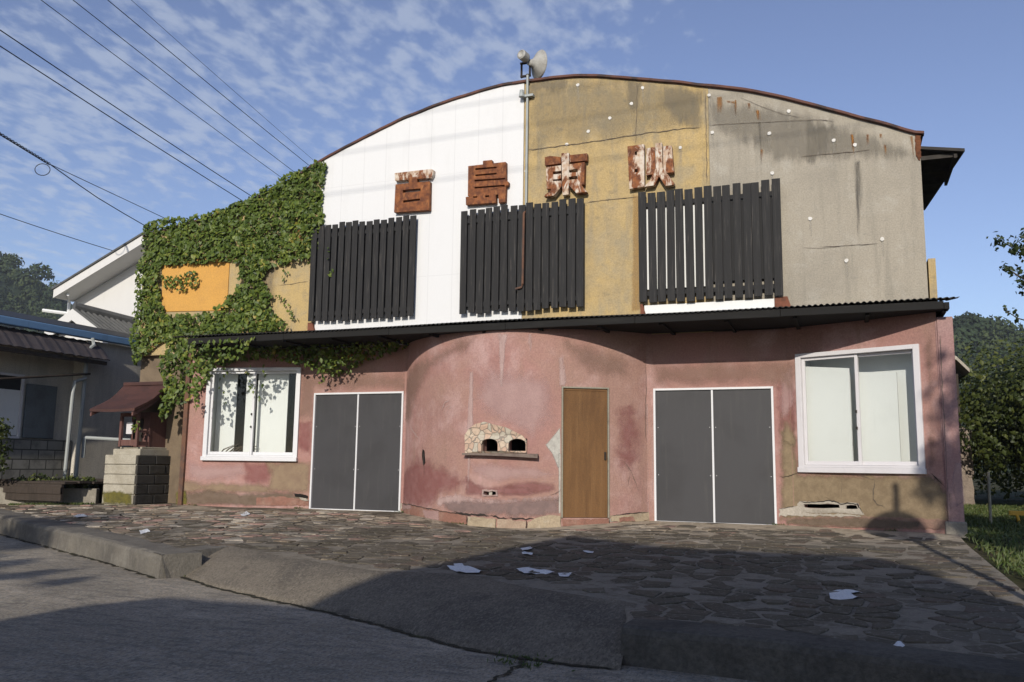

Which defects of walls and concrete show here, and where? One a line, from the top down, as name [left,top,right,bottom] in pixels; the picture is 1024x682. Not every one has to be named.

leakage [403,455,559,517]
peeling [781,408,948,528]